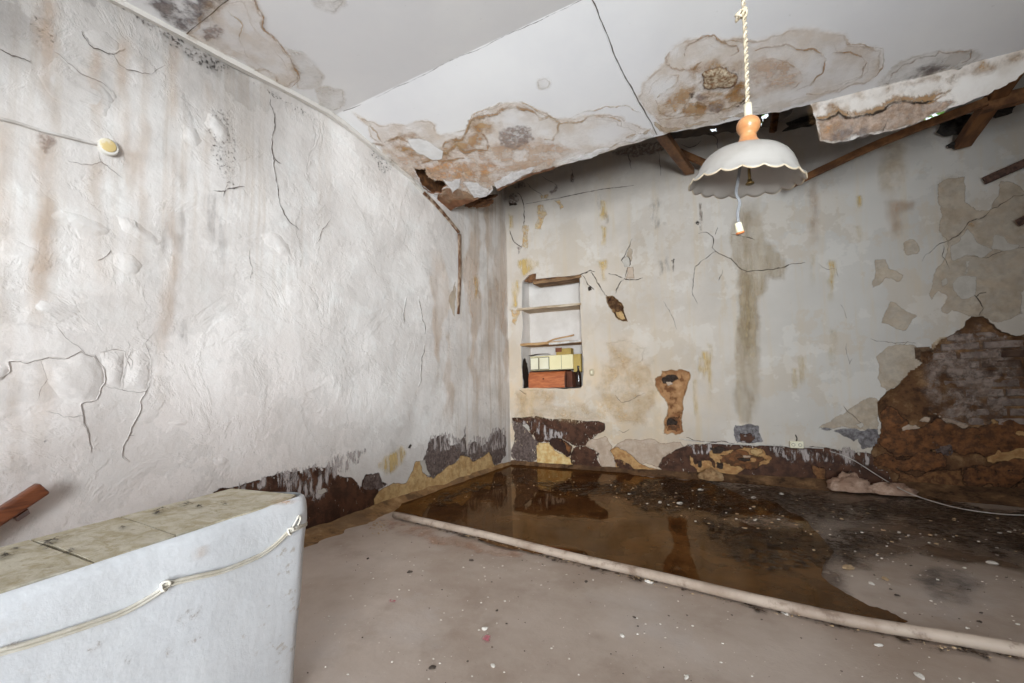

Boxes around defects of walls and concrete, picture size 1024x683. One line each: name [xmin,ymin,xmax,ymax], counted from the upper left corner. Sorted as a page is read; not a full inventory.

damp [657,82,745,119]
crack [270,100,295,226]
damp [371,102,584,195]
crack [692,230,838,302]
crack [4,326,152,462]
peeling [214,177,1024,535]
damp [740,282,762,349]